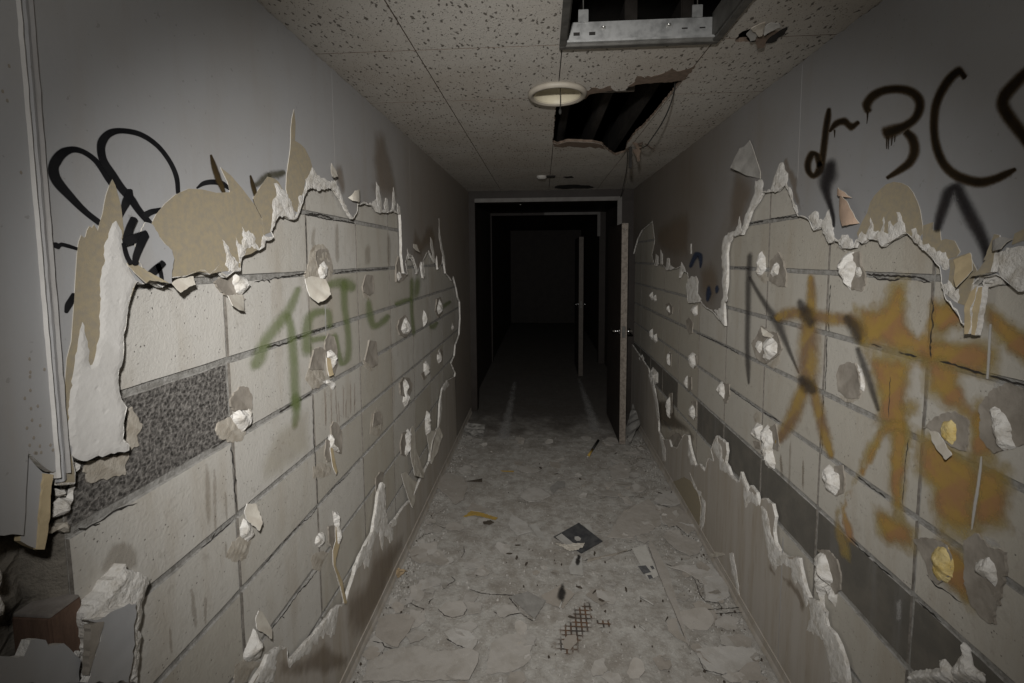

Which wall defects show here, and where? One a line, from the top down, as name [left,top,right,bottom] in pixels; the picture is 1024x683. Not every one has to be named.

spalling [746,22,788,49]
spalling [628,65,695,87]
spalling [0,357,69,656]
peeling [668,564,730,602]
peeling [696,646,759,675]